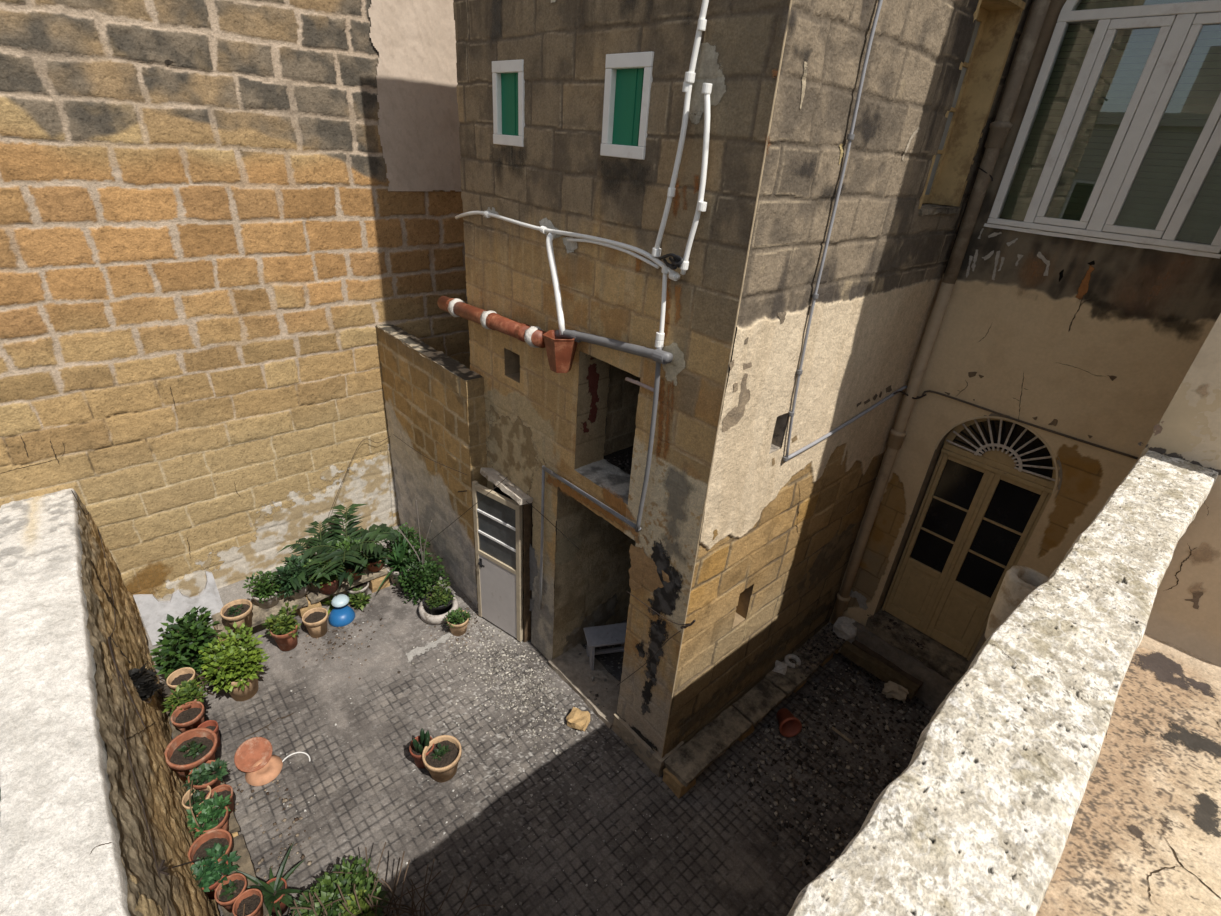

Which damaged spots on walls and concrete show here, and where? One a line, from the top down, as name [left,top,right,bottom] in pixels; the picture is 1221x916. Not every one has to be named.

leakage [795,48,810,109]
leakage [857,113,879,142]
crack [1168,543,1195,590]
leakage [1131,652,1219,701]
leakage [1142,721,1221,759]
crack [1147,838,1221,901]